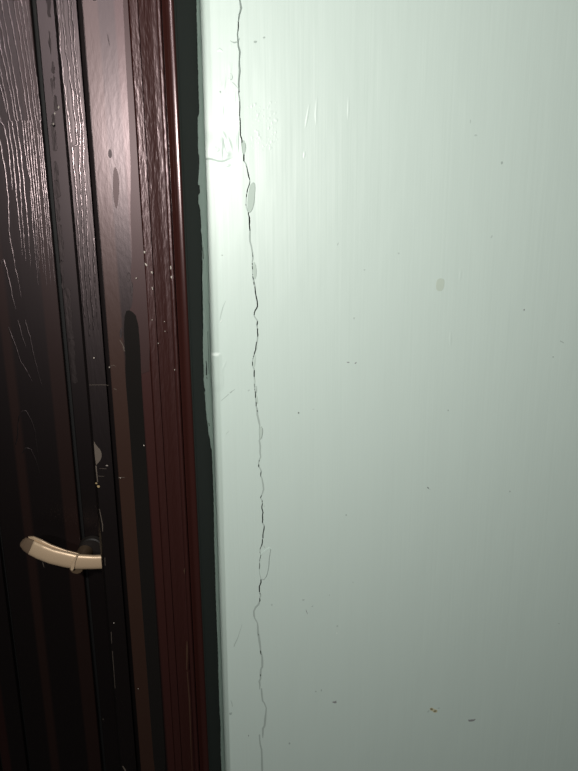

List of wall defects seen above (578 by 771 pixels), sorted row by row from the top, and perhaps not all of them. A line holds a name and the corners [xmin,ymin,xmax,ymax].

crack [232,0,267,771]